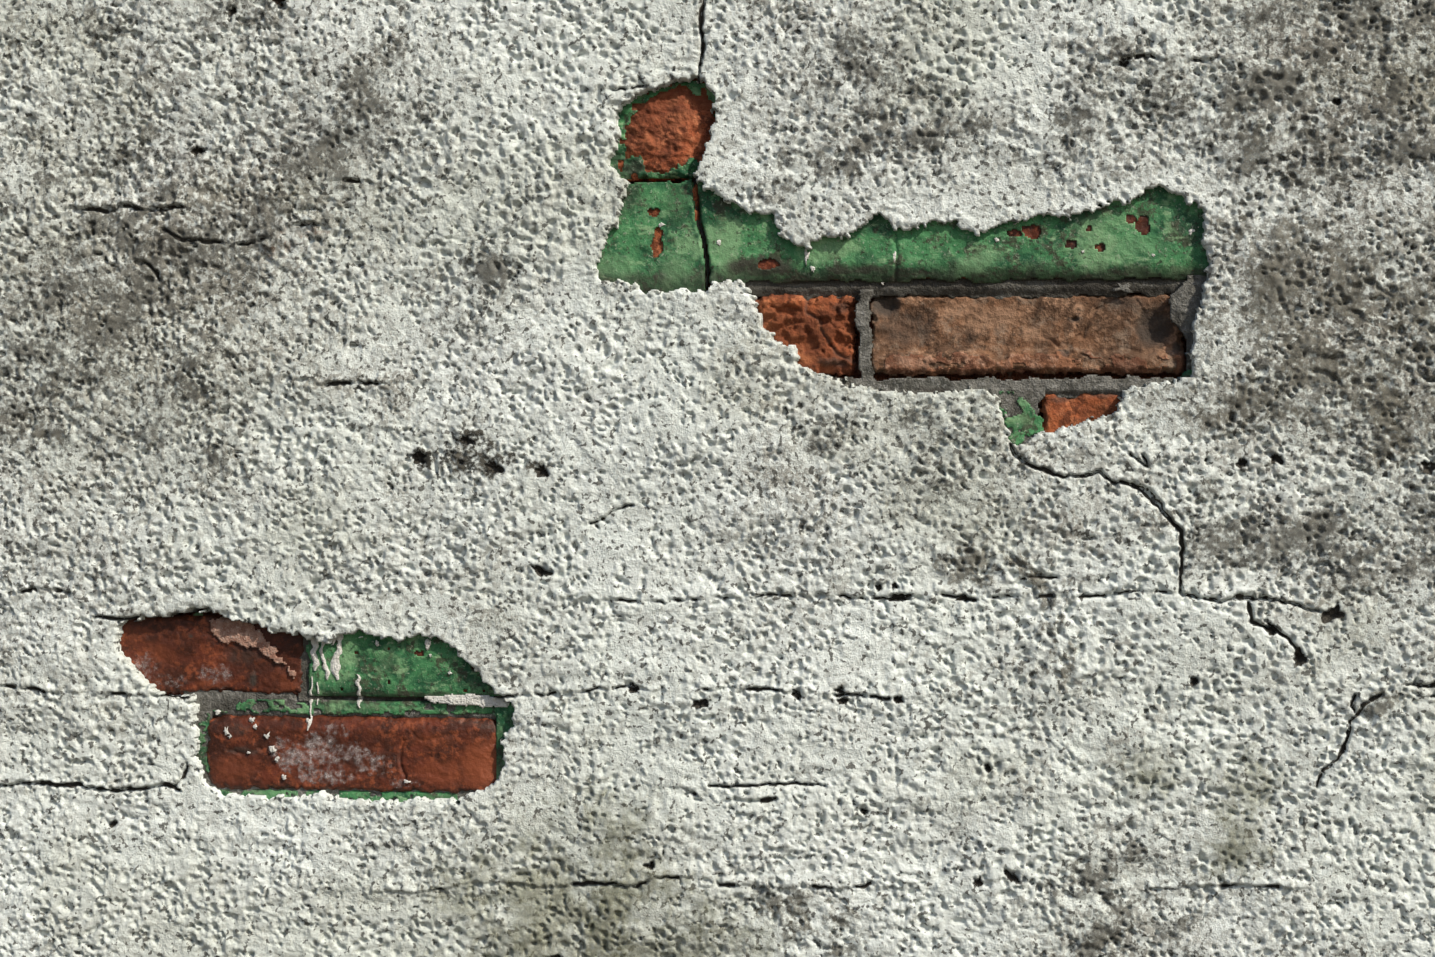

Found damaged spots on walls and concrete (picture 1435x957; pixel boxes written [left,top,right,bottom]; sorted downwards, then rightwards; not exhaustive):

crack [697,0,706,84]
spalling [597,78,1209,445]
crack [3,765,188,793]
spalling [120,612,515,803]
crack [1316,682,1435,787]